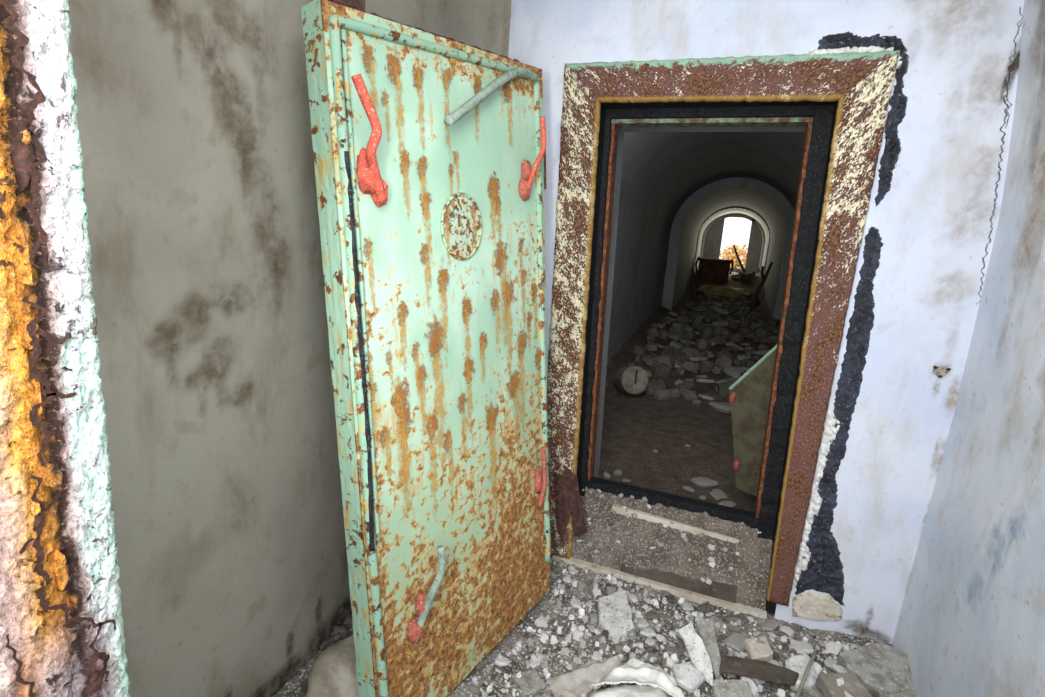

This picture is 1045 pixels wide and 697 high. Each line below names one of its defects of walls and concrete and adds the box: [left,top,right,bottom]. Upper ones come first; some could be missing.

flaking render [804,46,902,69]
corrosion [36,153,58,193]
corrosion [0,188,15,233]
corrosion [10,230,81,300]
corrosion [17,315,80,366]
corrosion [30,379,42,416]
corrosion [65,377,81,412]
corrosion [43,462,62,487]
corrosion [72,506,91,525]
corrosion [554,466,586,541]
corrosion [36,549,94,613]